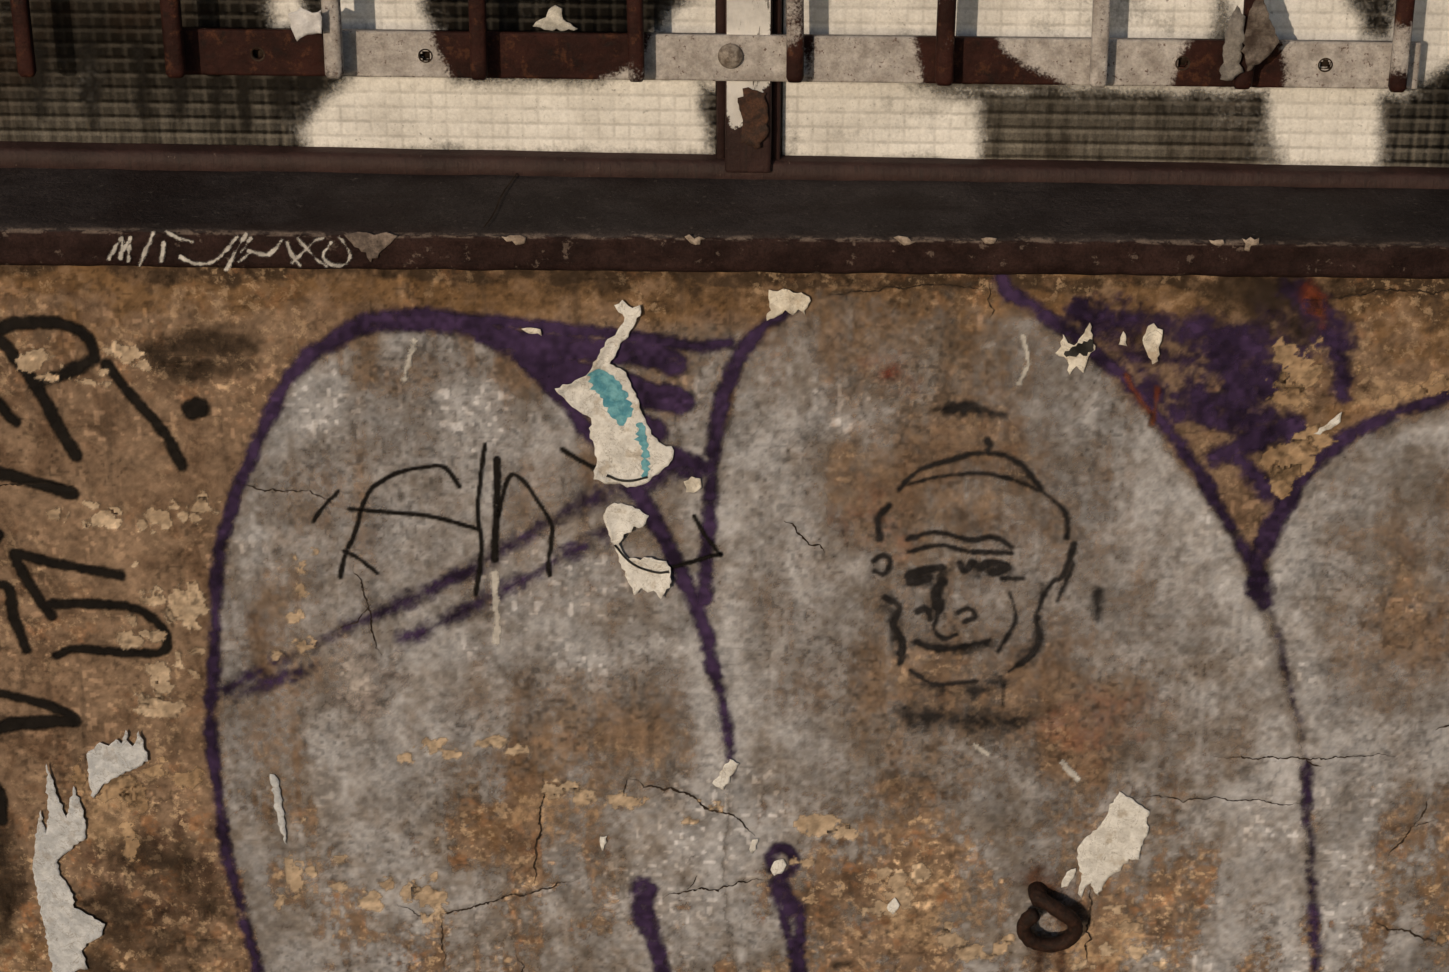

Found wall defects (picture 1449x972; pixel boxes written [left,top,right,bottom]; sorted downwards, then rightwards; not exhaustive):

spalling [1258,336,1338,499]
spalling [72,756,205,862]
crack [1137,795,1311,806]
crack [1213,753,1397,767]
crack [404,775,580,969]
corrosion [1026,867,1082,926]